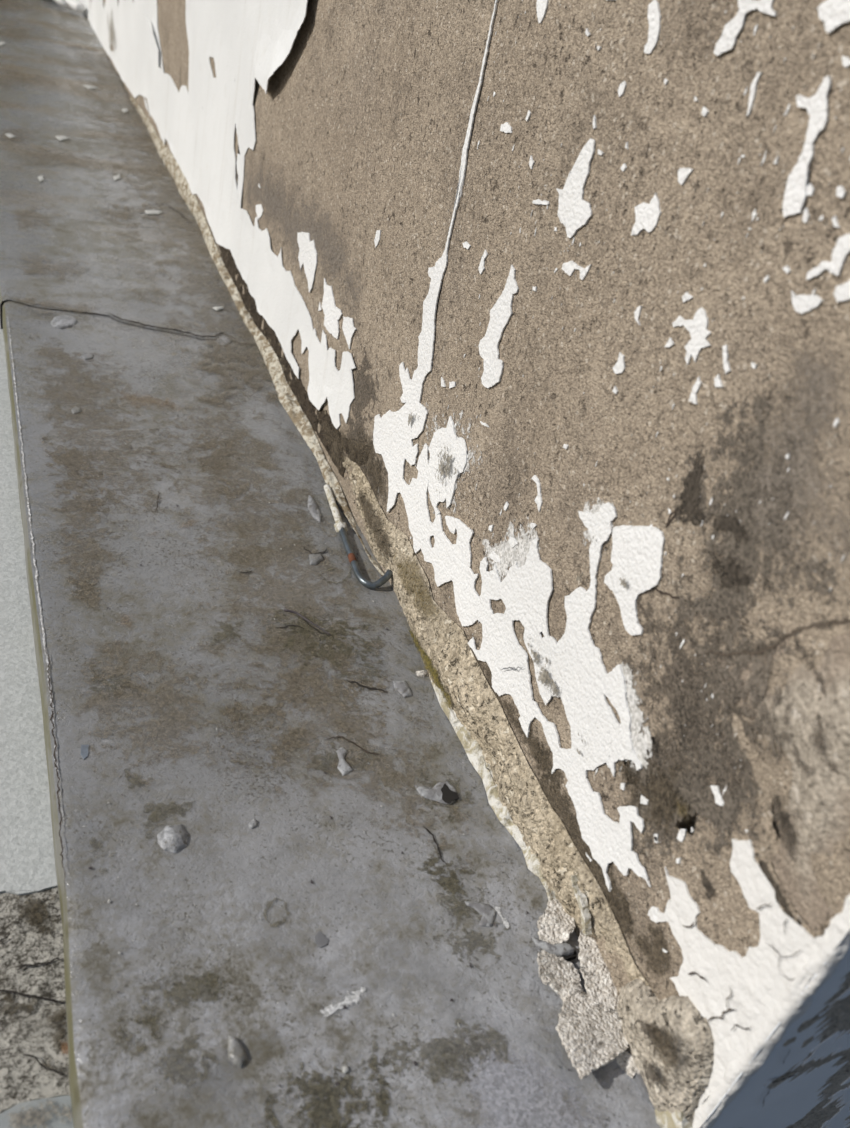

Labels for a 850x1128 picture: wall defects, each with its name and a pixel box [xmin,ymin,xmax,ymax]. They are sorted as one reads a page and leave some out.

peeling [145,0,189,92]
crack [14,298,236,339]
peeling [218,0,850,1128]
leakage [618,362,850,925]
crack [642,587,850,775]